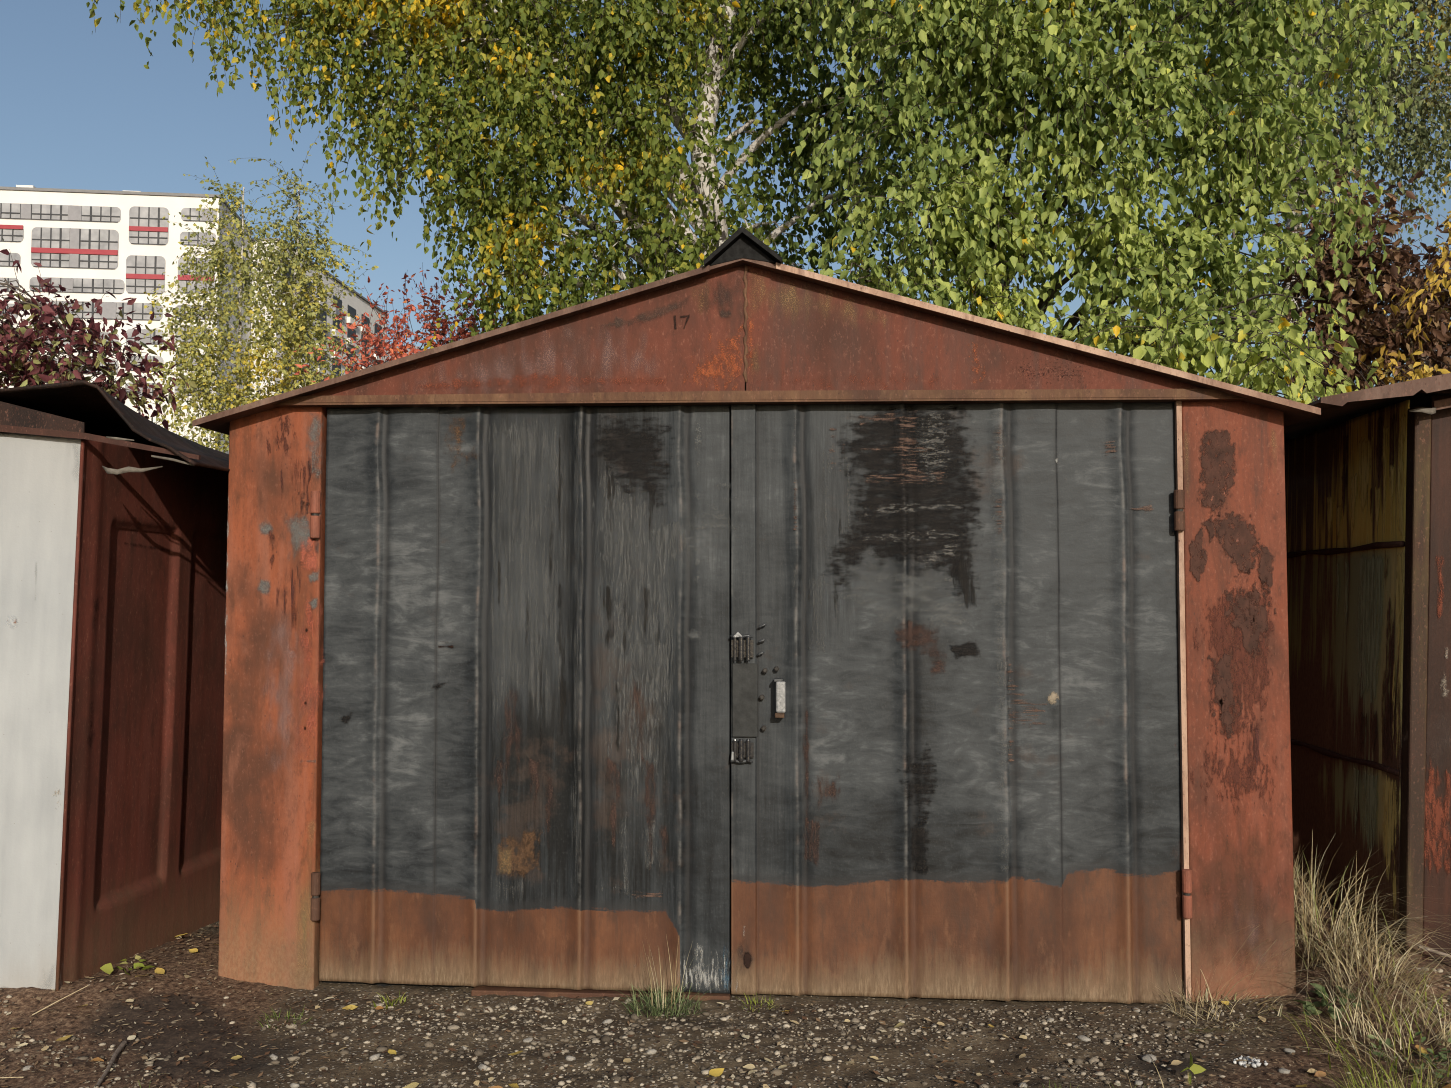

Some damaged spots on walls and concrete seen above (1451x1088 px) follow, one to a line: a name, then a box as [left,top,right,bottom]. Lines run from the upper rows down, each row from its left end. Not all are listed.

rust [267,413,291,454]
peeling [830,405,981,595]
rust [276,568,300,625]
peeling [1424,762,1451,873]
rust [498,832,540,876]